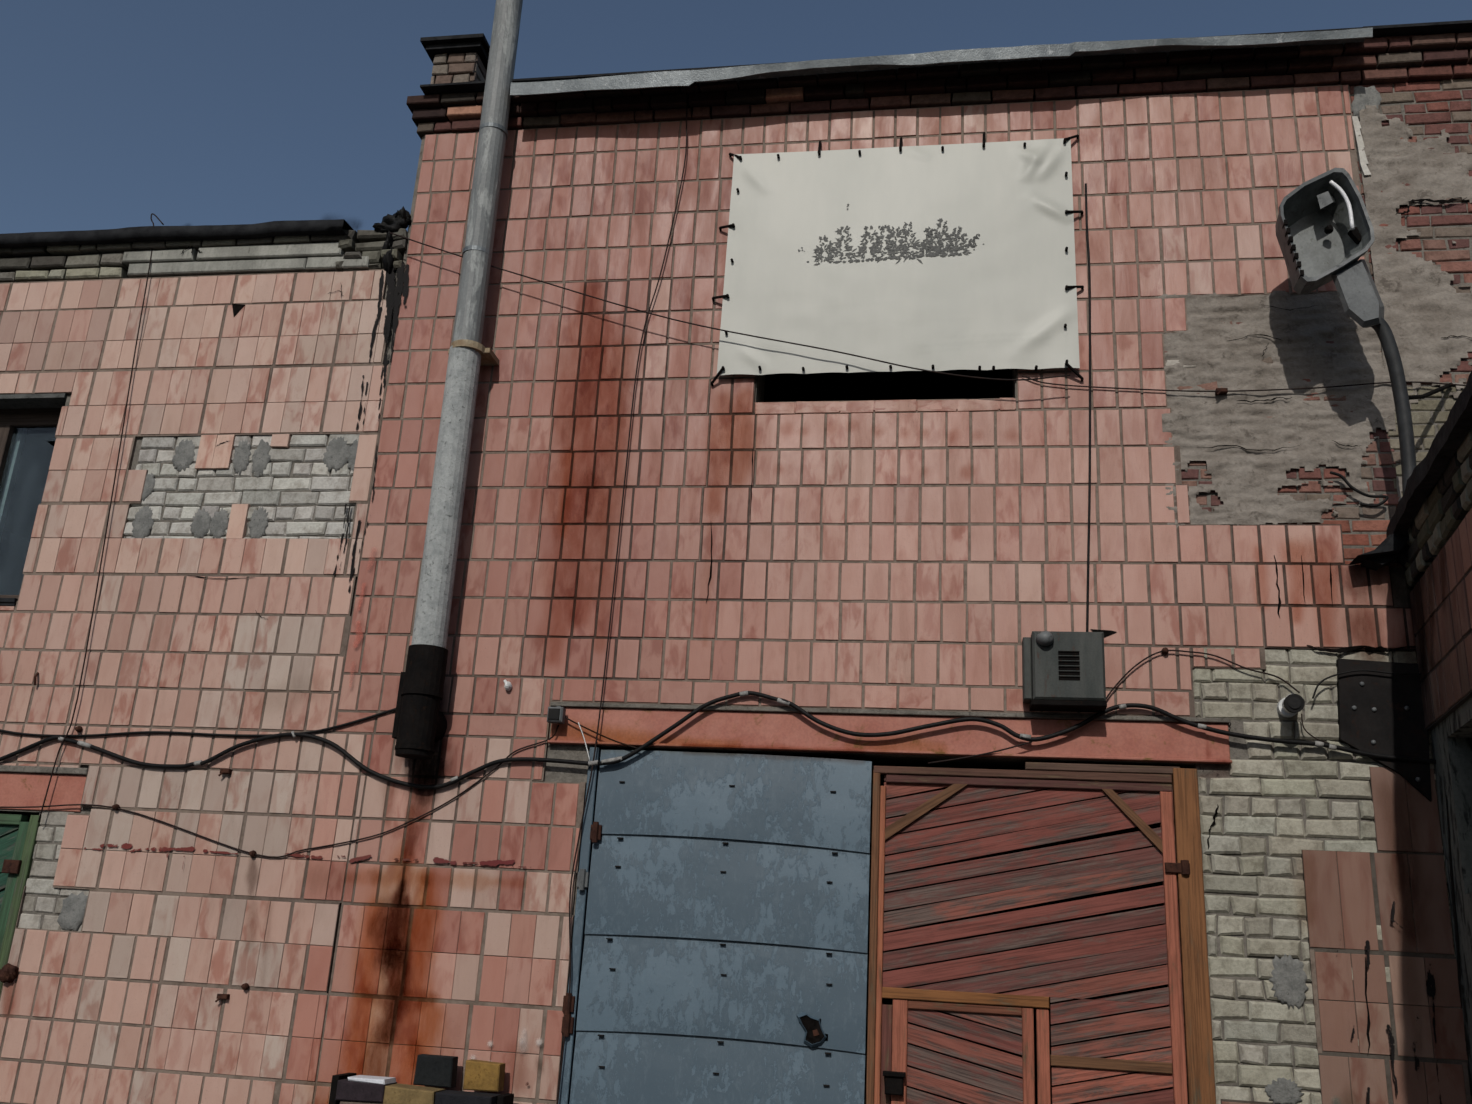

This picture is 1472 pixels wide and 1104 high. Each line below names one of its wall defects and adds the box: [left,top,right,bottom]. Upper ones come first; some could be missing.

leakage [356,262,409,430]
peeling [1155,78,1472,564]
spalling [124,434,359,539]
leakage [333,504,368,592]
spalling [18,811,89,931]
spalling [1192,648,1417,1104]
corrosion [382,881,407,1037]